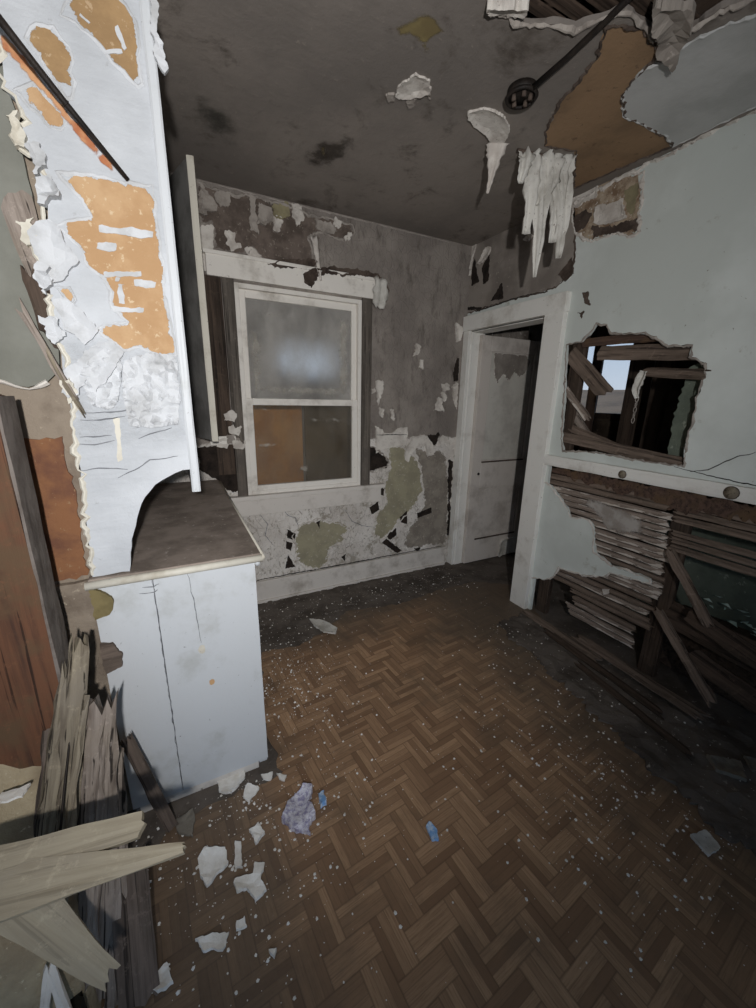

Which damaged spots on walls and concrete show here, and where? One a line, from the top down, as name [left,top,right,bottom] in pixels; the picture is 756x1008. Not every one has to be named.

peeling [386,72,432,110]
peeling [0,62,61,390]
peeling [196,180,390,309]
peeling [467,107,756,286]
crack [80,410,177,478]
peeling [285,518,352,571]
peeling [371,380,395,421]
peeling [369,432,453,553]
peeling [435,358,459,412]
spalling [532,482,652,585]